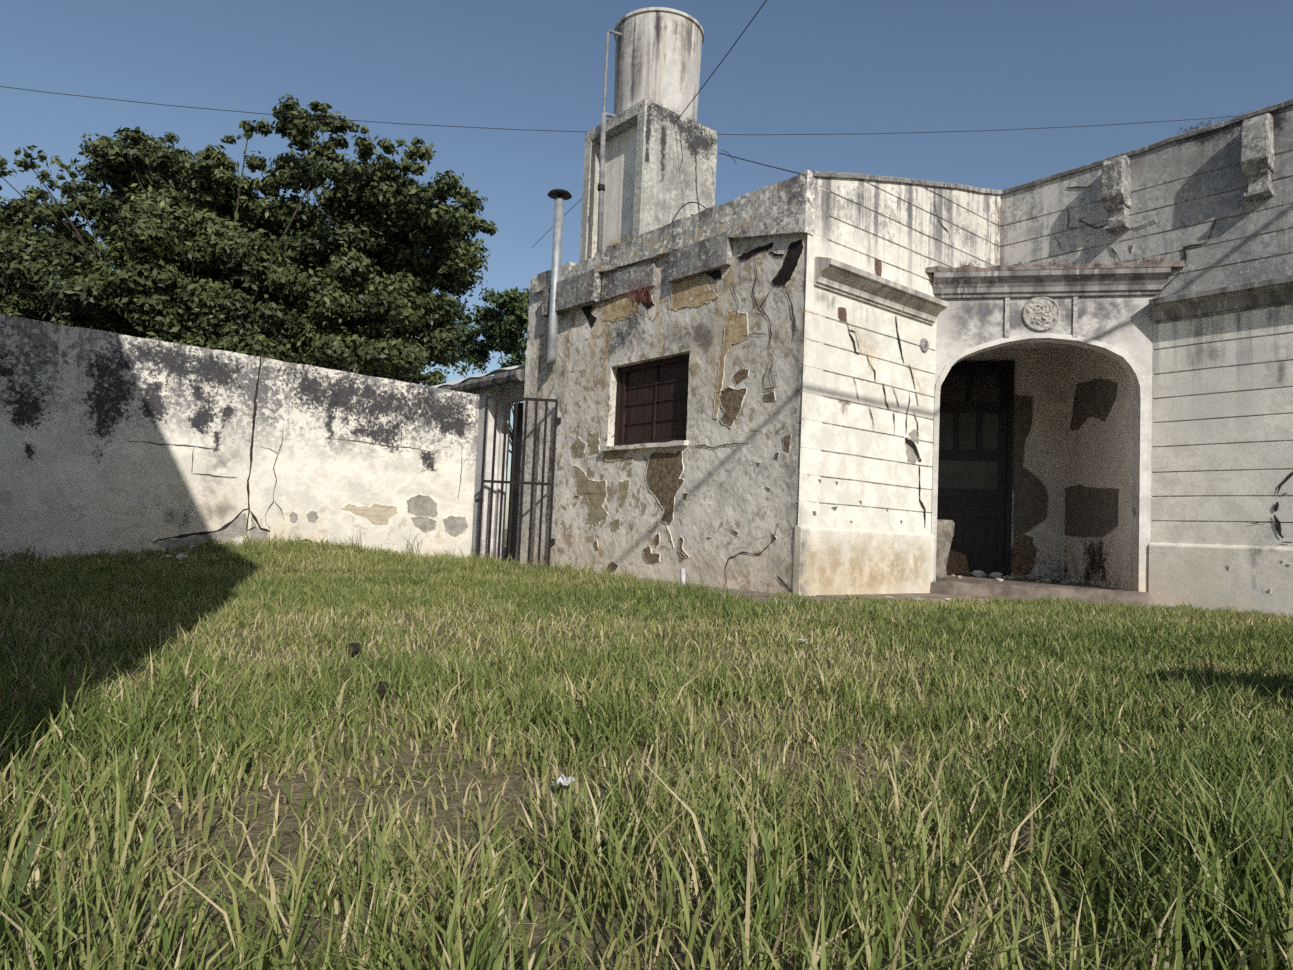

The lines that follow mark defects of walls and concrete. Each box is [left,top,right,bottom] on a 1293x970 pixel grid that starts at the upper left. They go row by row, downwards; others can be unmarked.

leakage [645,100,720,181]
flaking render [738,239,804,287]
leakage [84,342,249,463]
leakage [278,357,478,452]
flaking render [713,310,750,428]
crack [847,318,919,433]
crack [132,356,358,550]
flaking render [341,494,468,537]
leakage [420,450,437,472]
flaking render [570,432,690,564]
crack [918,466,926,523]
flaking render [1065,483,1135,539]